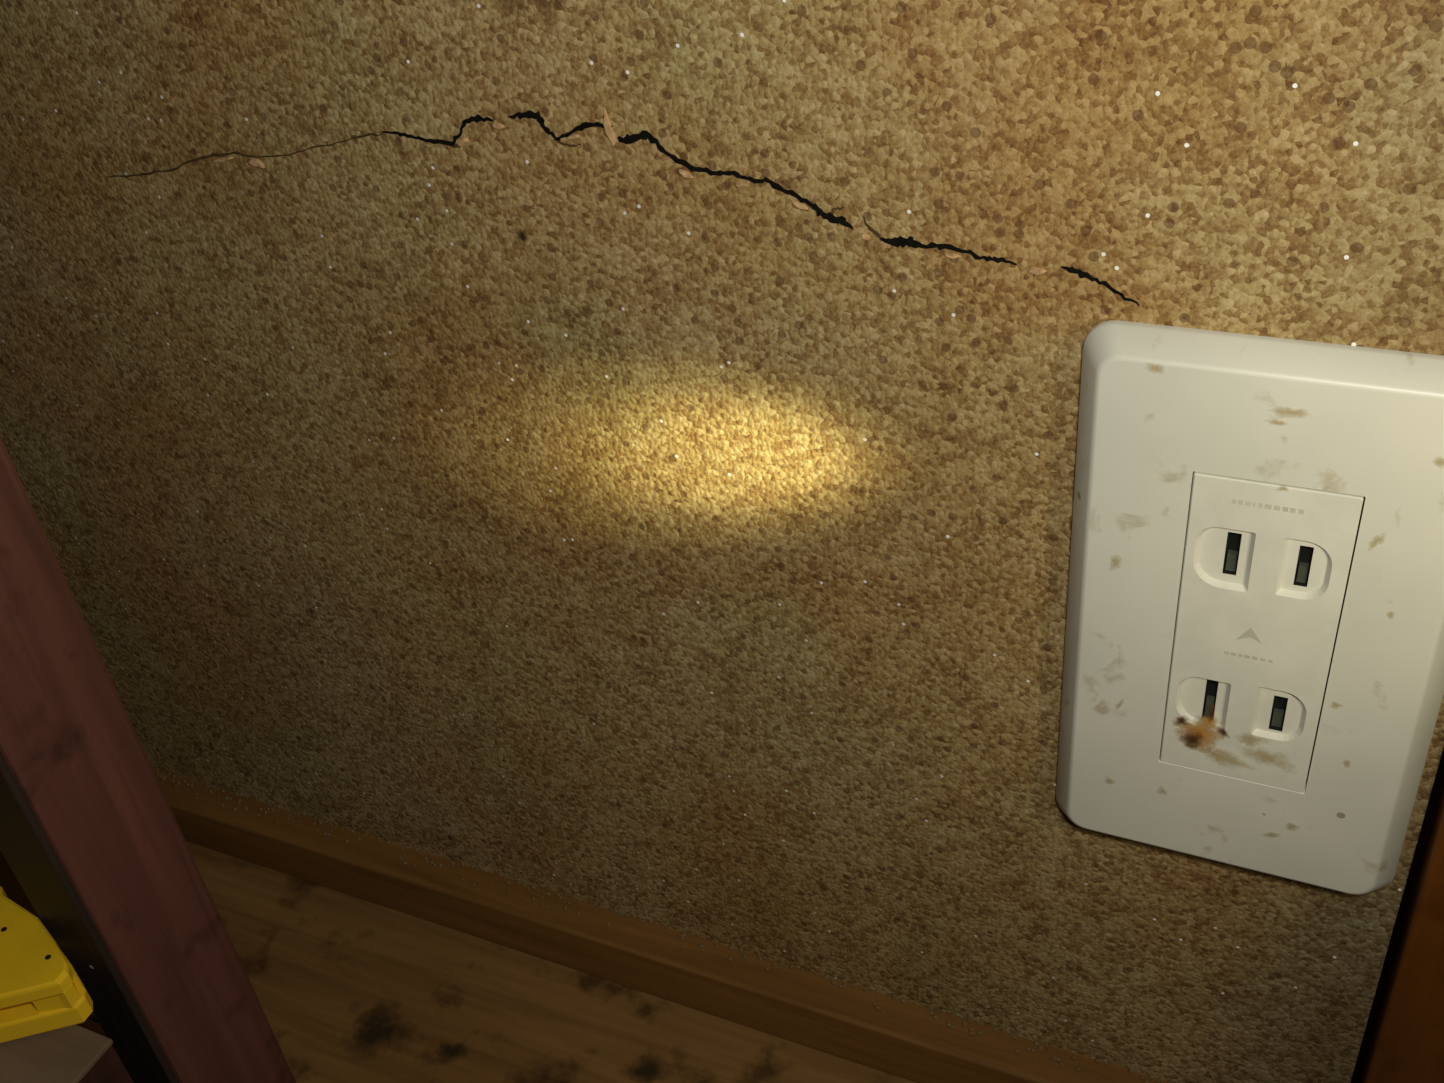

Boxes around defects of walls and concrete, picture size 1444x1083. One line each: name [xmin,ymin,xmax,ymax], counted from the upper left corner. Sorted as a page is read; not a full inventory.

crack [109,108,1140,306]